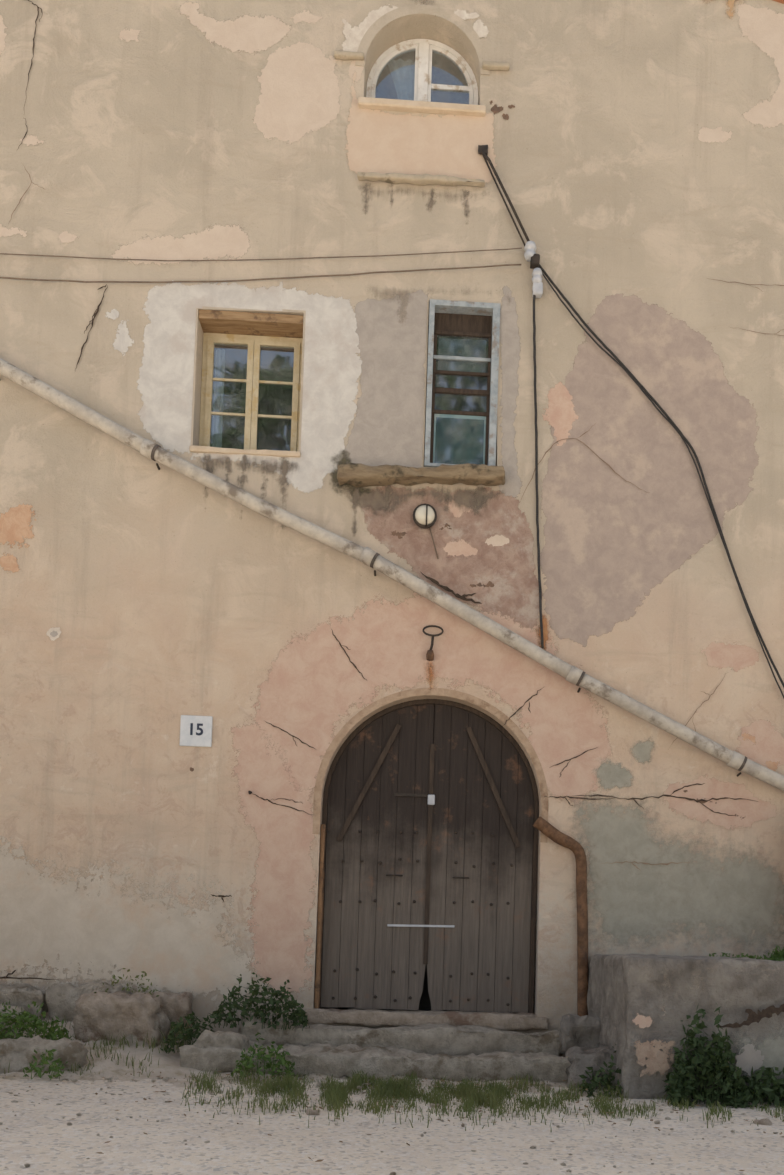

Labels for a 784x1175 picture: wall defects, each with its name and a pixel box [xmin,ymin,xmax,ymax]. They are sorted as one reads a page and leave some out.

crack [8,0,44,224]
crack [76,284,108,368]
crack [254,794,311,815]
crack [265,721,315,749]
flaking render [0,485,613,1008]
crack [546,748,758,816]